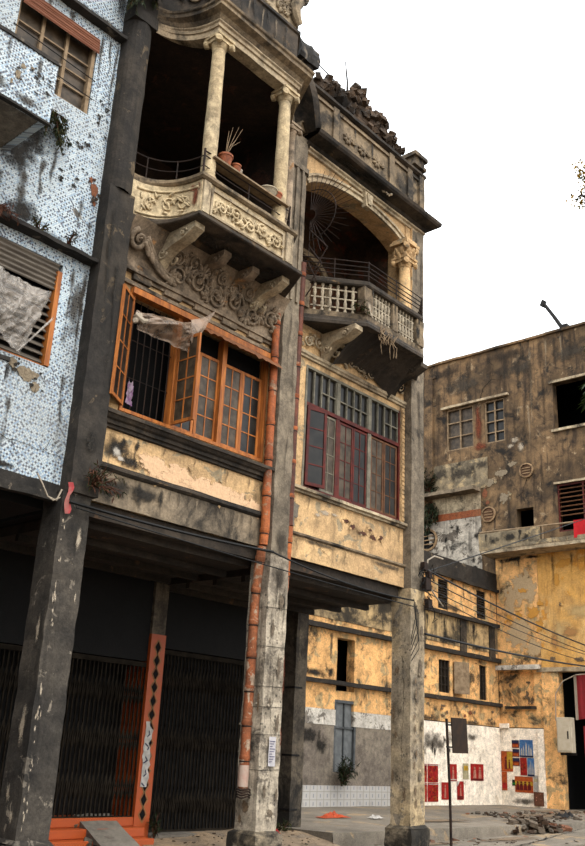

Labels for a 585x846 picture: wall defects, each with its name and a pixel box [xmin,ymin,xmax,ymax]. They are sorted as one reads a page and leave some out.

spalling [9,357,43,392]
leakage [436,352,531,411]
leakage [86,432,140,468]
leakage [435,461,487,481]
leakage [100,480,189,506]
peeling [342,517,384,542]
spalling [18,706,41,740]
mould [304,728,326,752]
spalling [263,786,278,820]